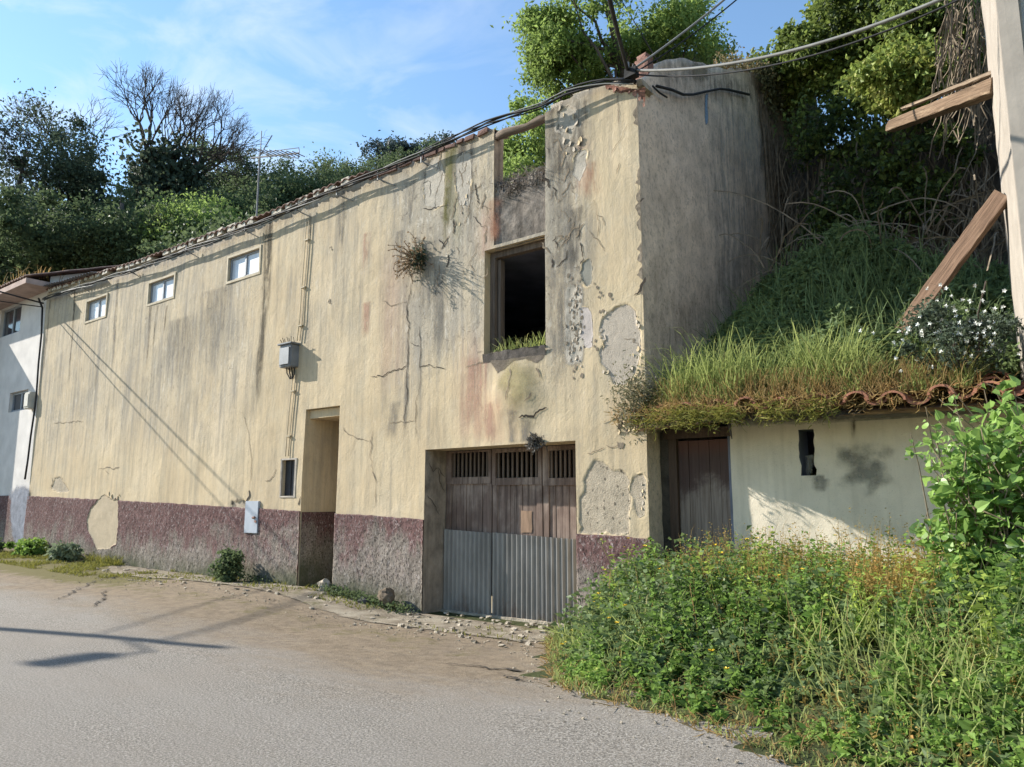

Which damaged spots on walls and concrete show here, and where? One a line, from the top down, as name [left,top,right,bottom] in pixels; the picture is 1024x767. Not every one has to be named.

flaking render [542,104,643,388]
water stain [256,224,272,382]
crack [343,287,483,504]
crack [519,405,547,418]
peeling [9,486,29,546]
flaking render [87,492,118,550]
flaking render [577,461,648,536]
water stain [840,451,881,485]